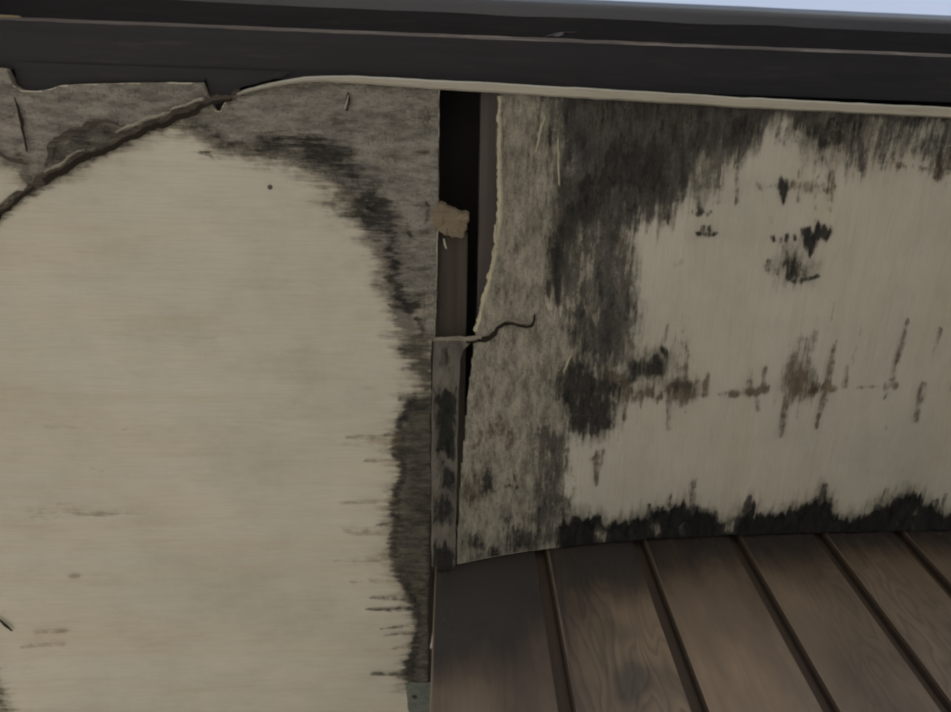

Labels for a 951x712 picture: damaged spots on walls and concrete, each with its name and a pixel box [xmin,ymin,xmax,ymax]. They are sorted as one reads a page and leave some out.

crack [0,89,242,219]
damp [0,69,546,683]
damp [539,96,951,486]
damp [549,482,951,617]